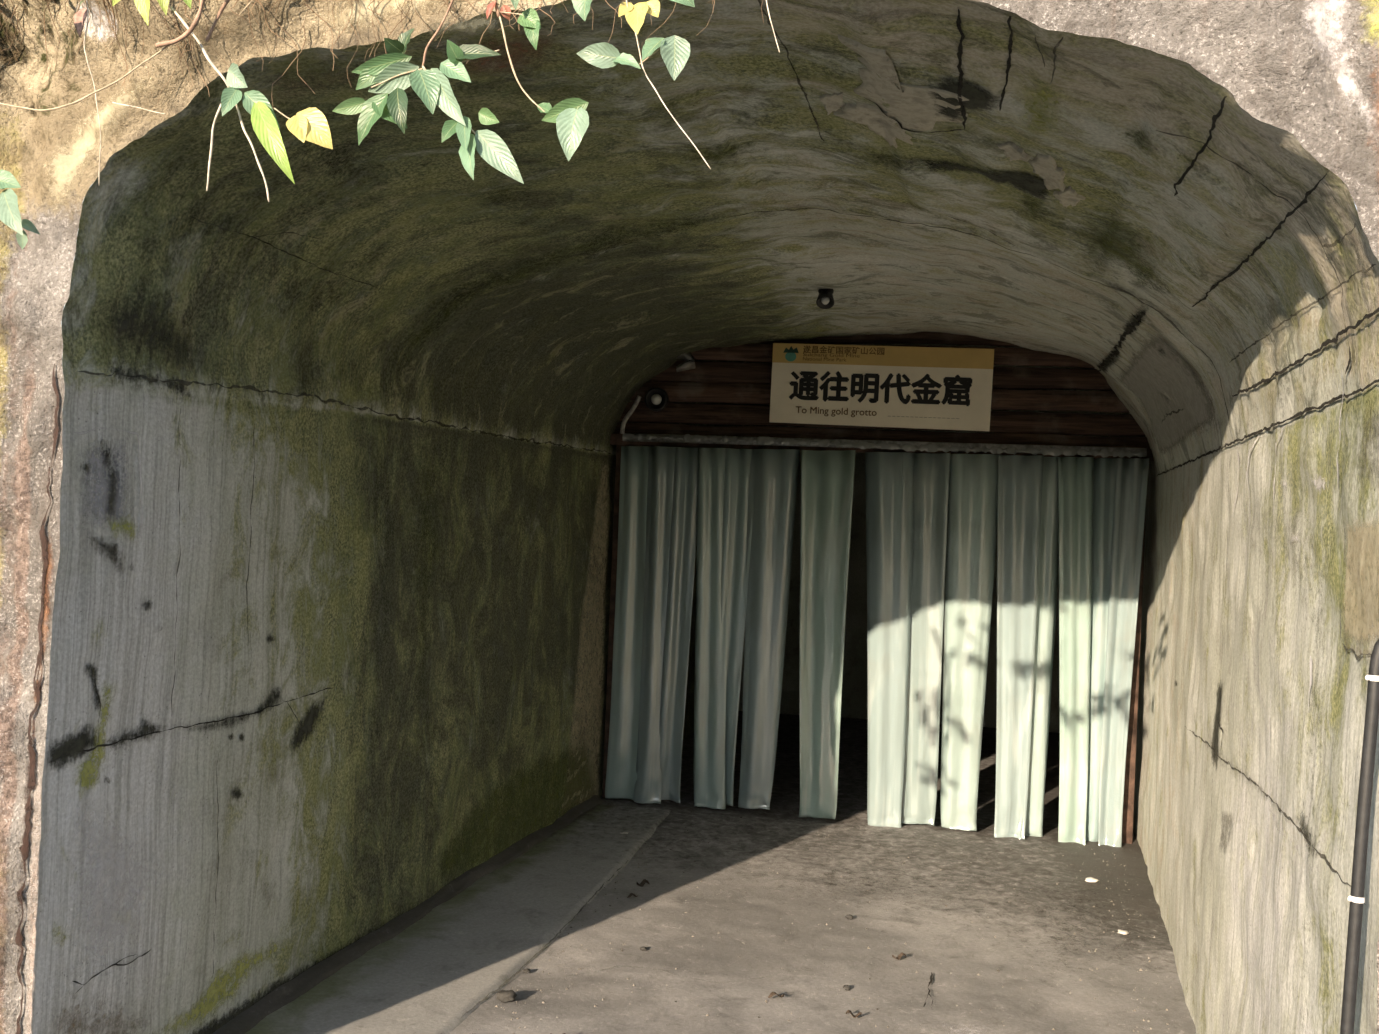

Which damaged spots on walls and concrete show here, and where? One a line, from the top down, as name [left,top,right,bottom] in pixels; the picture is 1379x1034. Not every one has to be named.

peeling [819,34,998,148]
peeling [925,141,1086,208]
crack [1156,130,1355,374]
crack [1097,305,1145,375]
damp [50,552,181,768]
crack [15,364,335,1034]
damp [190,689,280,741]
damp [291,699,324,751]
crack [1185,536,1366,905]